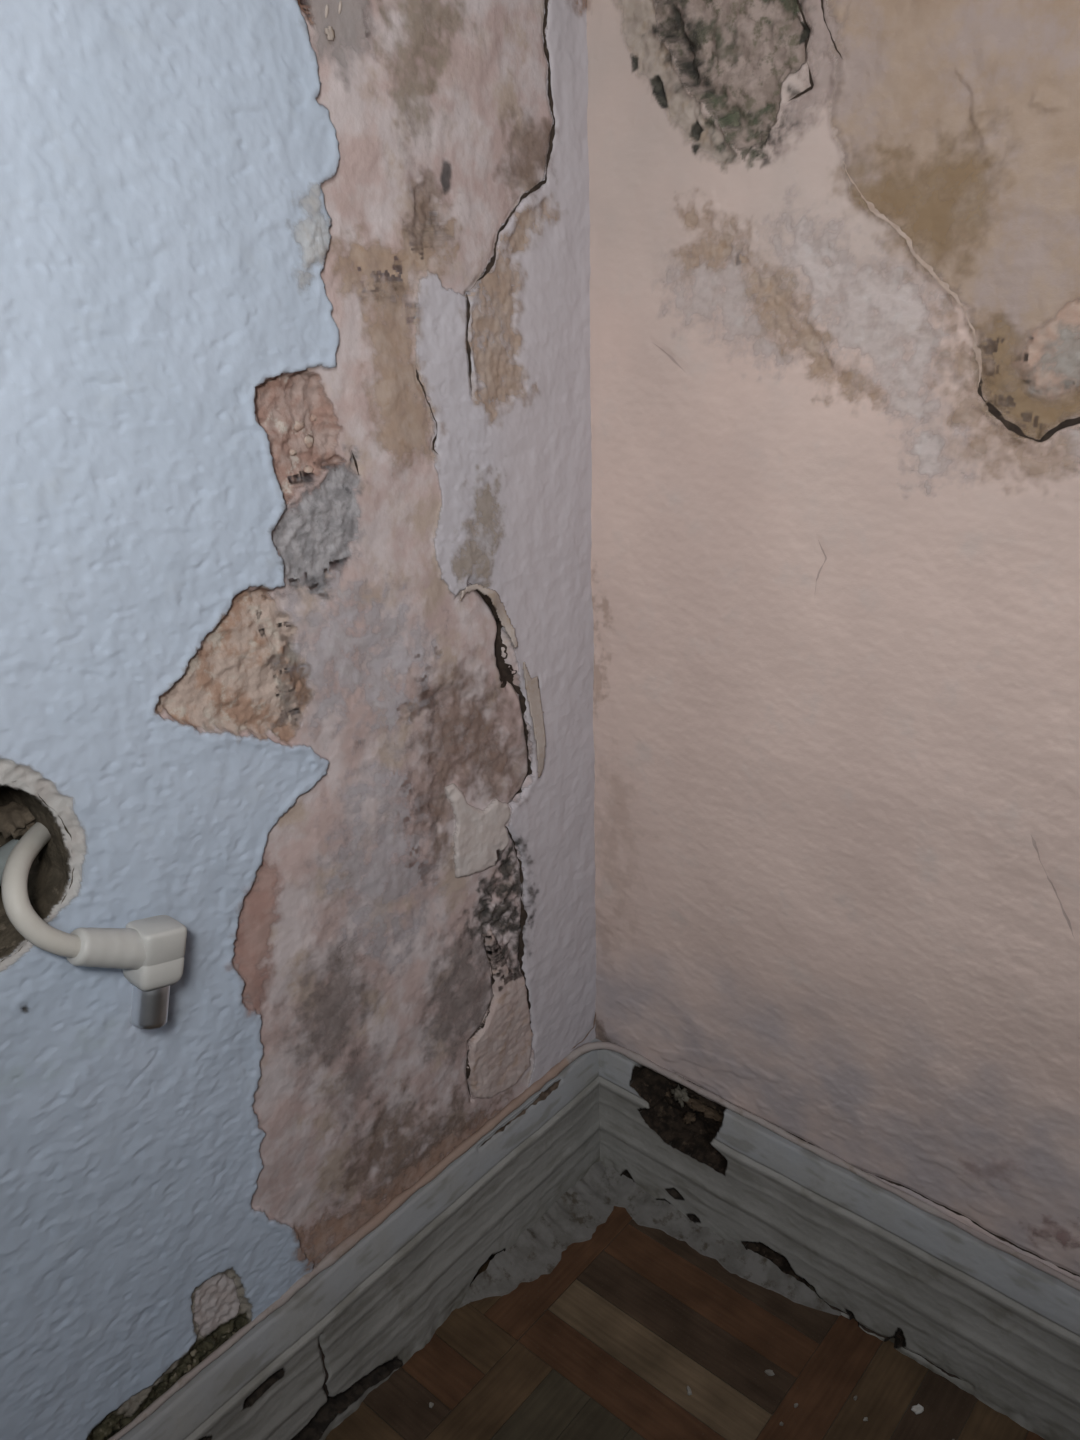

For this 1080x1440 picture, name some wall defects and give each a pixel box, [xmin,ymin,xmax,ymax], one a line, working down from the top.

water stain [619,0,737,164]
crack [466,0,555,396]
peeling [652,0,1080,441]
spalling [254,370,346,504]
crack [415,366,438,454]
spalling [155,587,313,742]
water stain [272,456,537,1061]
crack [466,582,539,1097]
water stain [344,1097,475,1200]
spalling [629,1065,727,1176]
spalling [87,1268,255,1440]
crack [243,1368,285,1409]